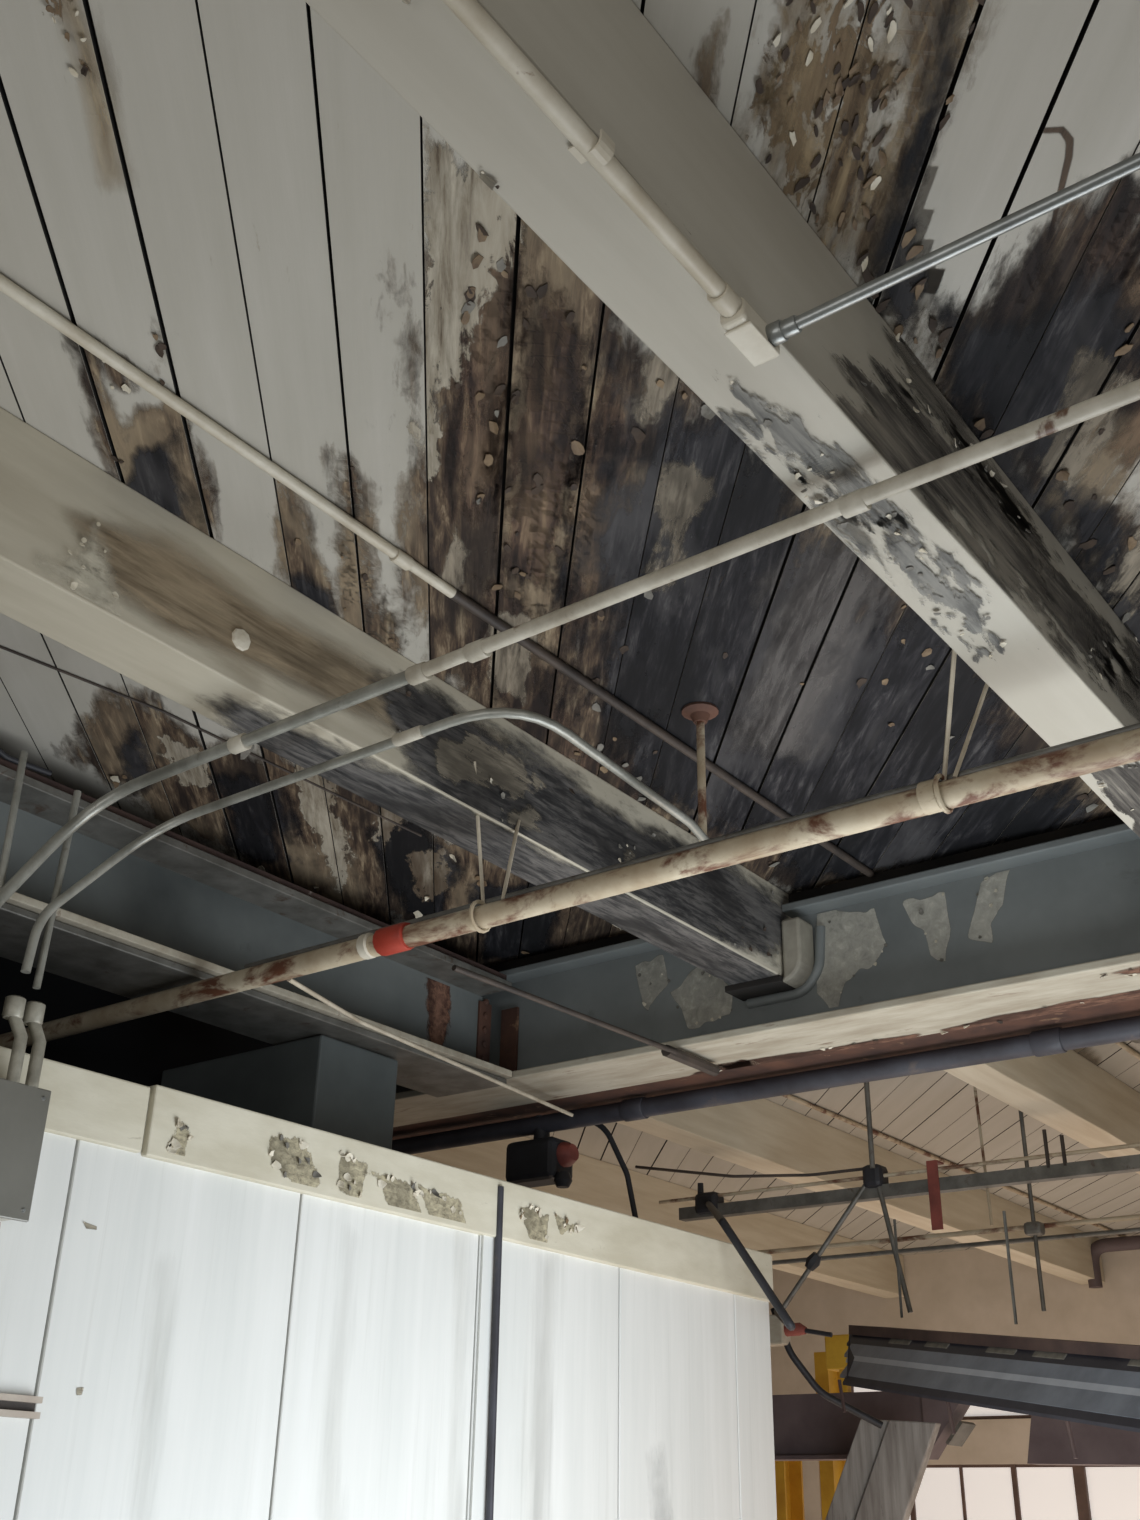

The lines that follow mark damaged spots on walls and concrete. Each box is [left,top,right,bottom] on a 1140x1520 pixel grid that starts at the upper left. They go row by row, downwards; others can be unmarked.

peeling [746,0,916,272]
water stain [862,0,1140,442]
water stain [274,125,1050,839]
peeling [718,326,1140,726]
water stain [992,400,1140,644]
water stain [67,687,536,925]
water stain [740,776,1116,894]
rust [426,978,451,1046]
rust [682,1034,921,1078]
peeling [817,908,888,1008]
rust [941,966,1140,1035]
peeling [269,1135,466,1223]